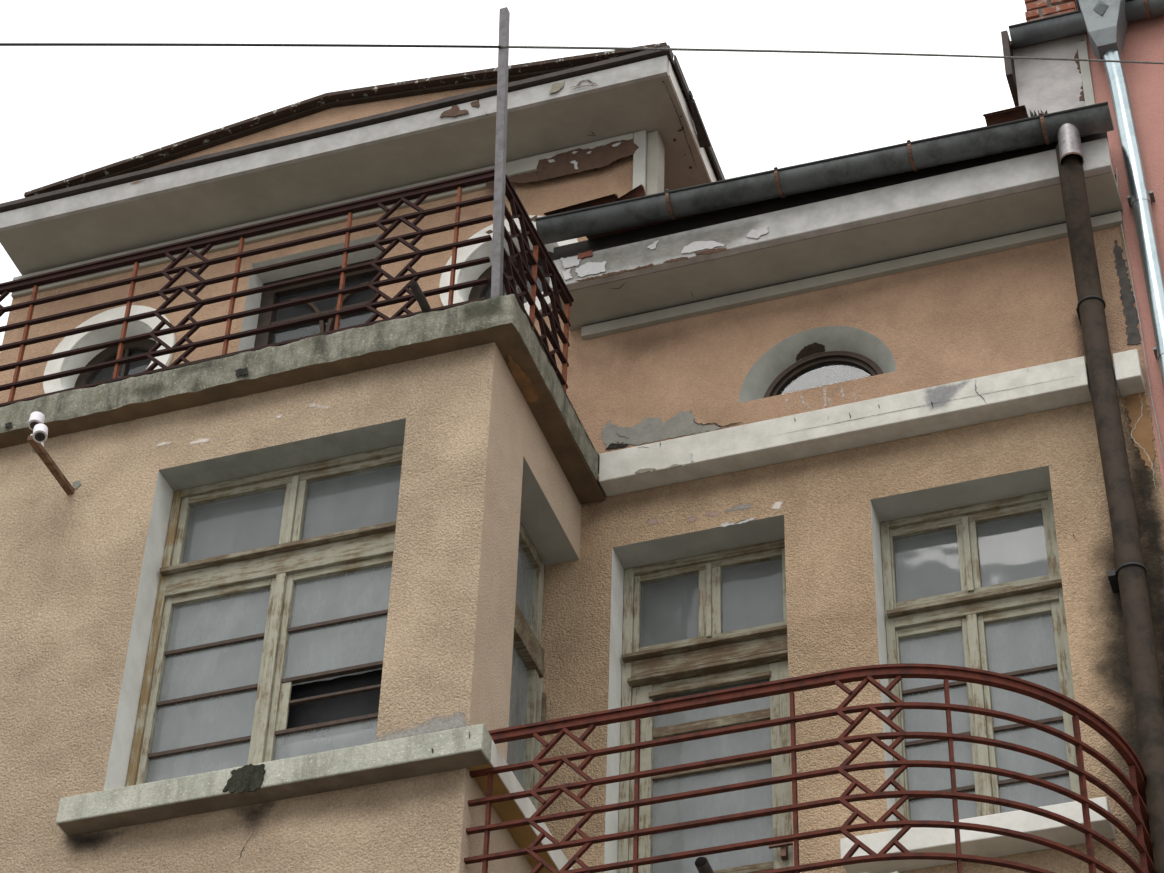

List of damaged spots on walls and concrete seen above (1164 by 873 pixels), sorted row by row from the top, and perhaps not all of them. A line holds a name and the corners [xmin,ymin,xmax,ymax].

peeling [440,99,488,118]
peeling [509,139,639,183]
flaking render [601,410,741,449]
damp [1129,419,1164,705]
damp [1100,545,1142,778]